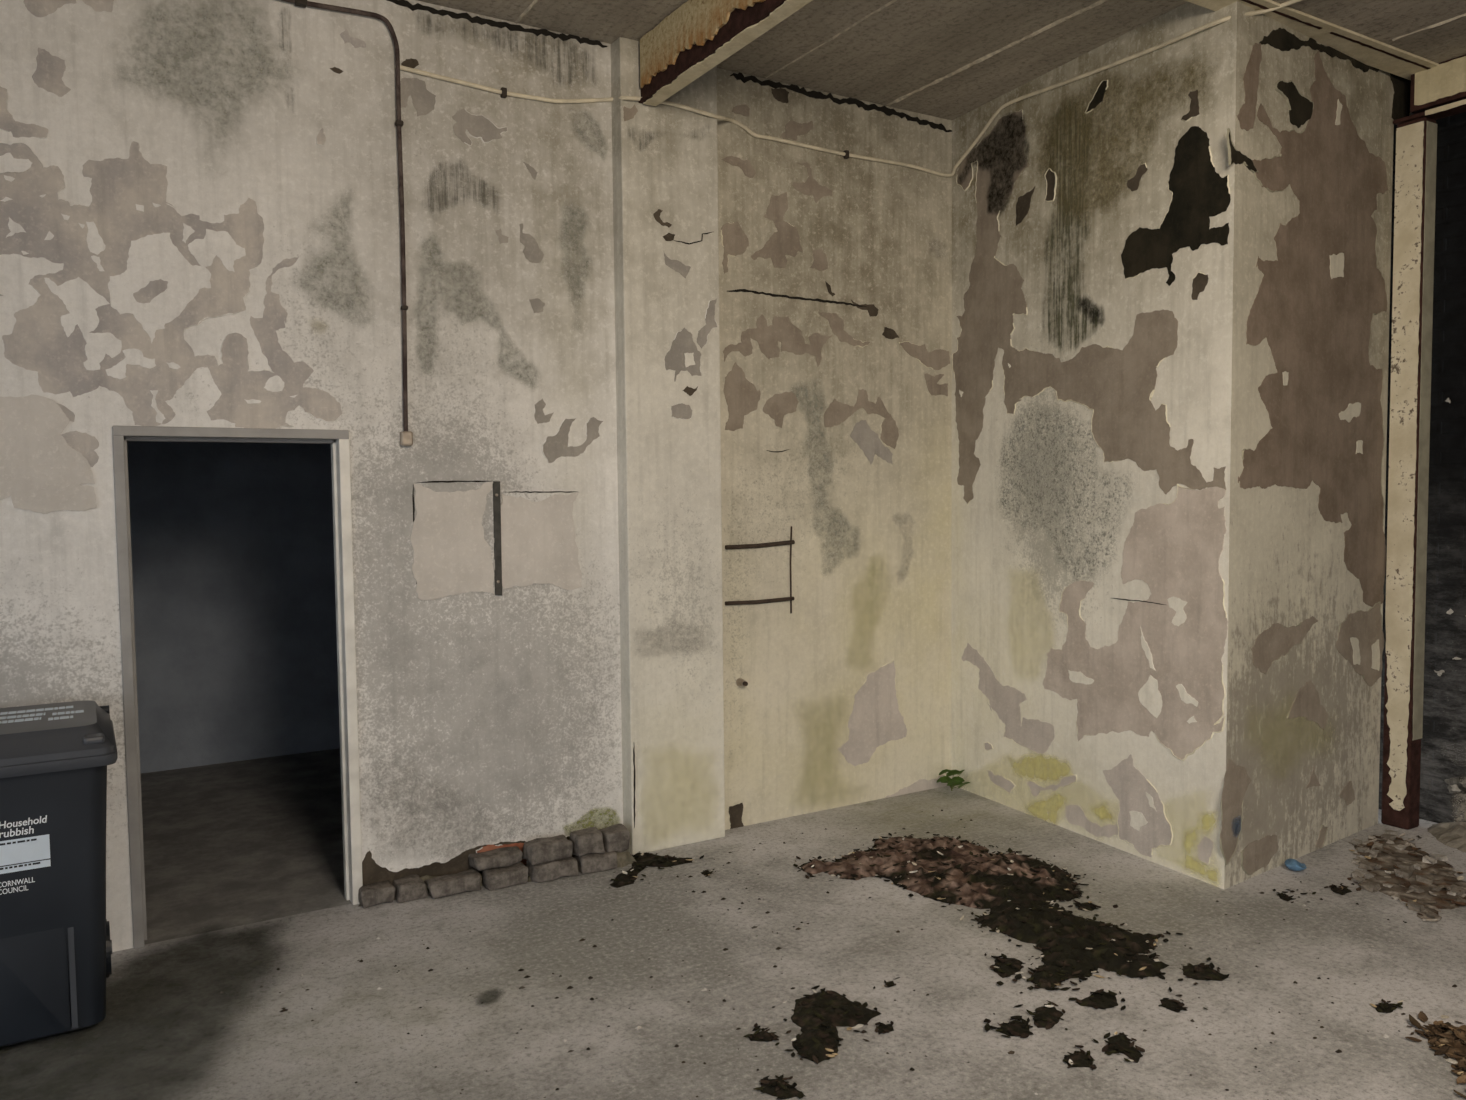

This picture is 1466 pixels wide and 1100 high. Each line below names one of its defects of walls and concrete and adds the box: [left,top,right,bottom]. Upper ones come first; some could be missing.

peeling [32,48,71,97]
damp [148,2,273,116]
damp [959,66,1205,348]
peeling [0,86,342,467]
peeling [534,398,603,463]
peeling [665,28,1466,811]
damp [1002,412,1125,575]
spalling [729,803,744,829]
peeling [1065,754,1173,857]
peeling [1220,759,1279,875]